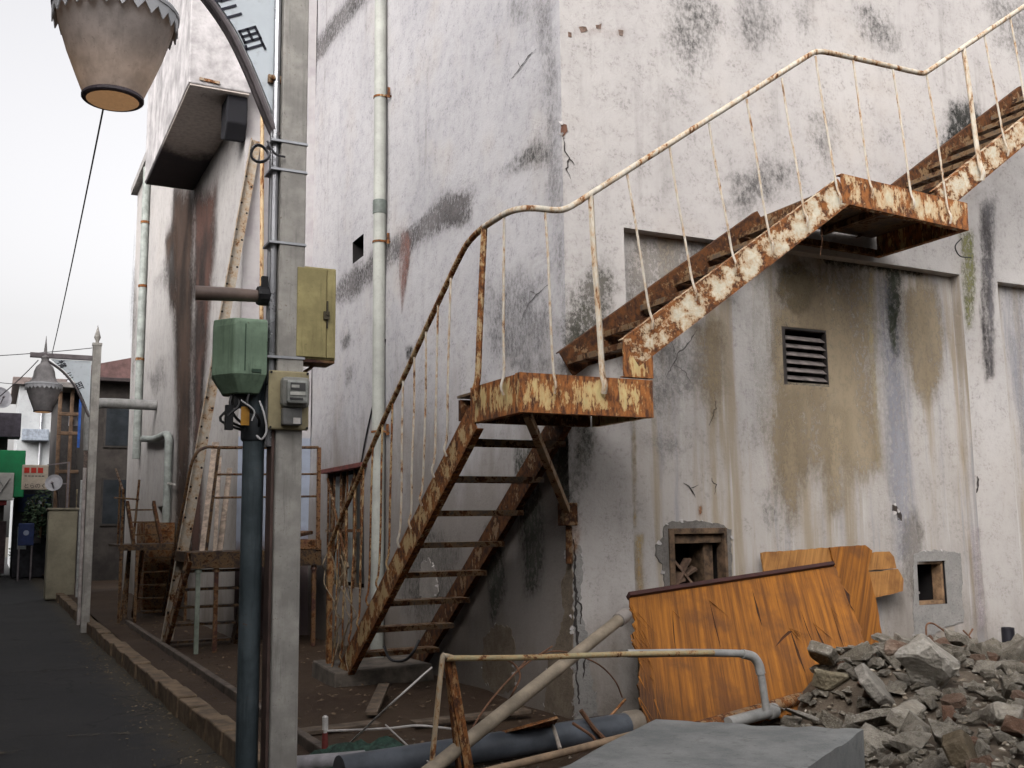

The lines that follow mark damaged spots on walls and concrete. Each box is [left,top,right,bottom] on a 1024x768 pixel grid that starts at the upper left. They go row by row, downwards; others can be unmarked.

leakage [386,193,473,264]
leakage [336,257,373,302]
corrosion [399,235,410,296]
leakage [964,204,994,377]
leakage [164,188,216,551]
leakage [753,259,944,595]
flaking render [655,519,733,586]